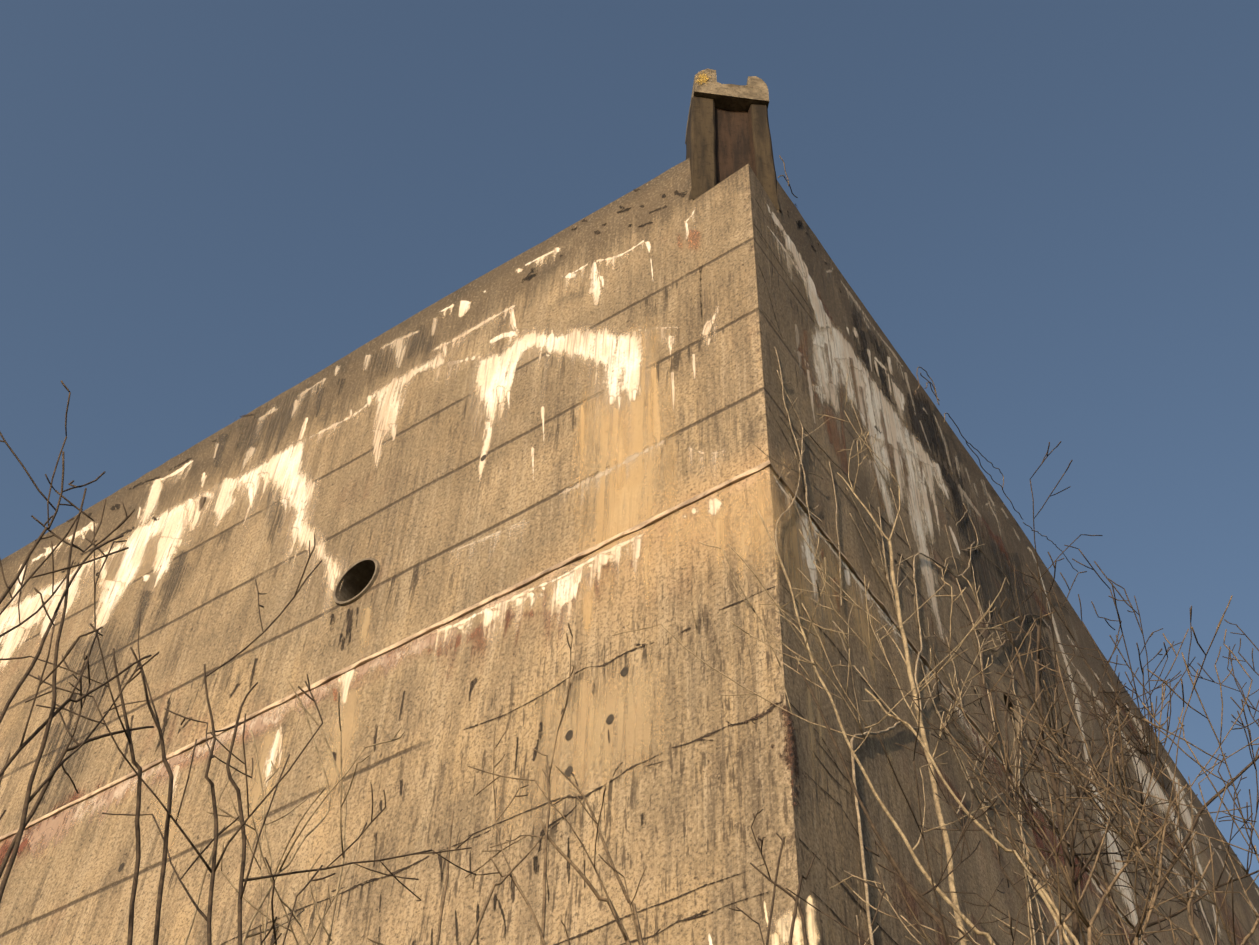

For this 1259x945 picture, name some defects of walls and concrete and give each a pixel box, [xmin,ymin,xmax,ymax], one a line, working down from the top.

leakage [516,247,560,273]
leakage [562,240,653,305]
leakage [0,300,677,867]
leakage [669,202,1259,945]
leakage [493,877,516,940]
leakage [533,856,549,903]
leakage [567,838,585,888]